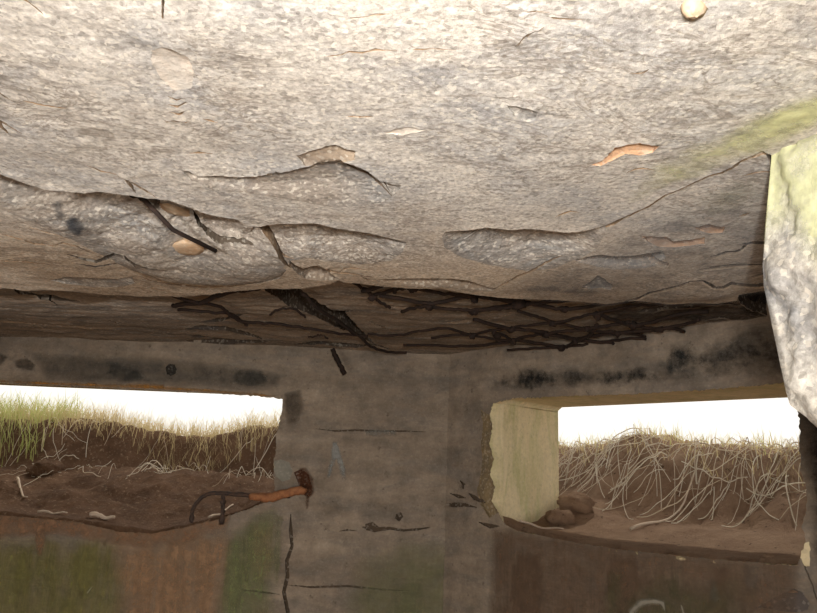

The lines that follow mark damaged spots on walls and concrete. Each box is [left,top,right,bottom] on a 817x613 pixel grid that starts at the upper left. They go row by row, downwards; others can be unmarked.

crack [0,120,20,134]
crack [0,93,63,108]
spalling [181,145,402,207]
spalling [593,143,659,166]
crack [606,151,770,227]
peeling [0,174,767,375]
crack [498,255,563,287]
crack [628,241,765,320]
corrosion [300,468,313,502]
crack [239,514,430,613]